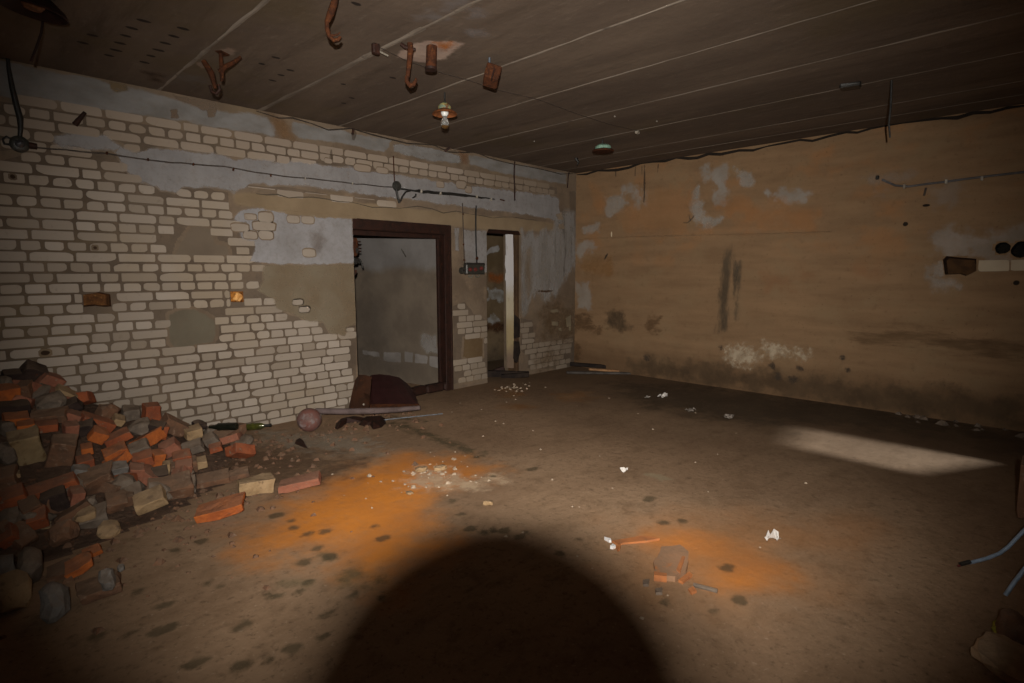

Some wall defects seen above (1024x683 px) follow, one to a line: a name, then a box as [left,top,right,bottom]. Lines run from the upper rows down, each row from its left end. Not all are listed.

flaking render [234,208,356,336]
peeling [0,59,651,325]
leakage [535,236,1024,453]